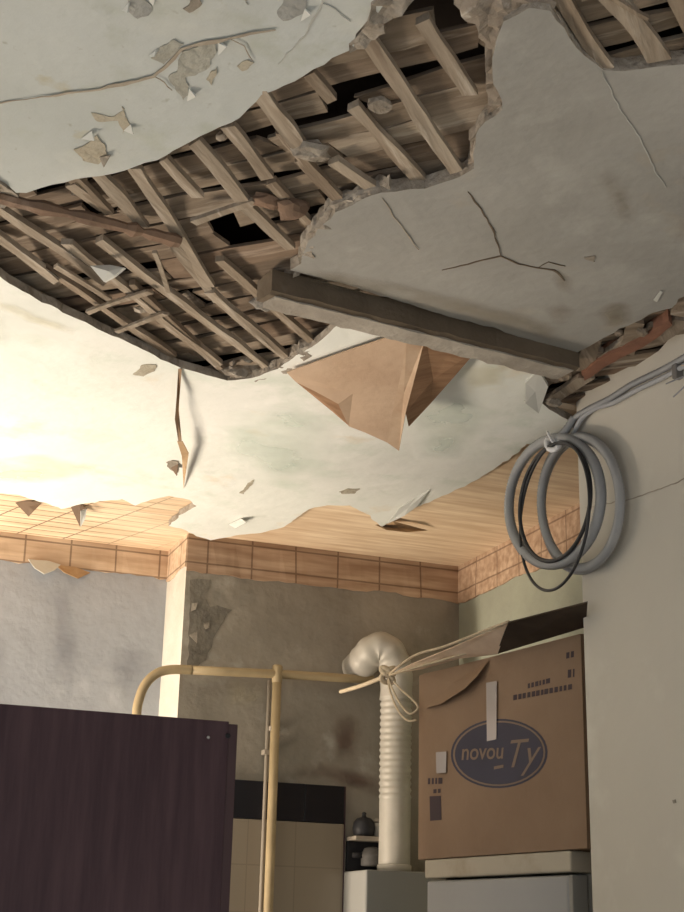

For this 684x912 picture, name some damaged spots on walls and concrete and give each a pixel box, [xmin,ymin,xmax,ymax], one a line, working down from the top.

flaking render [277,0,311,22]
crack [278,0,351,65]
crack [0,29,276,104]
flaking render [149,39,227,101]
flaking render [74,107,134,167]
crack [443,192,565,281]
flaking render [91,265,126,283]
flaking render [133,364,157,376]
spalling [525,297,684,426]
peeling [0,493,192,551]
peeling [227,444,580,566]
flaking render [187,579,232,666]